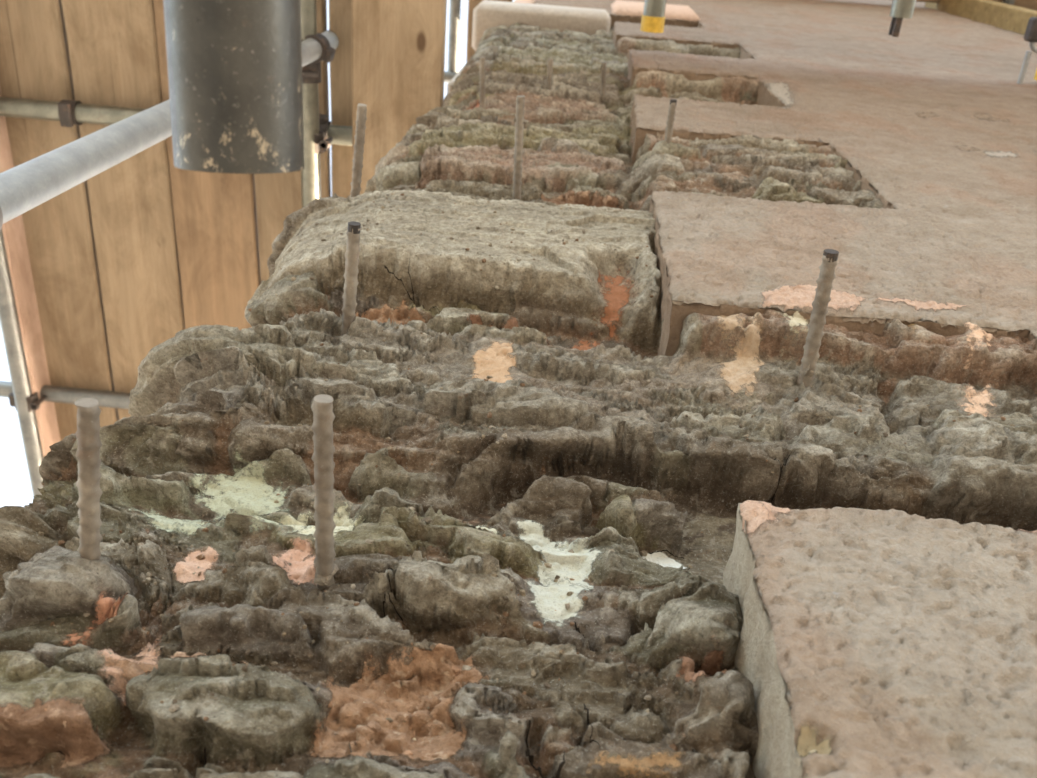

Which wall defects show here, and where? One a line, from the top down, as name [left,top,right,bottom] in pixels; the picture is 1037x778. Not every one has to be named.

corrosion [567,267,639,351]
corrosion [472,342,516,383]
damp [129,452,315,539]
damp [333,502,365,537]
spalling [740,500,793,534]
spalling [173,546,219,583]
spalling [269,537,317,585]
damp [517,520,601,626]
peeling [642,552,685,569]
spalling [63,593,207,707]
spalling [0,697,112,770]
spalling [309,643,489,761]